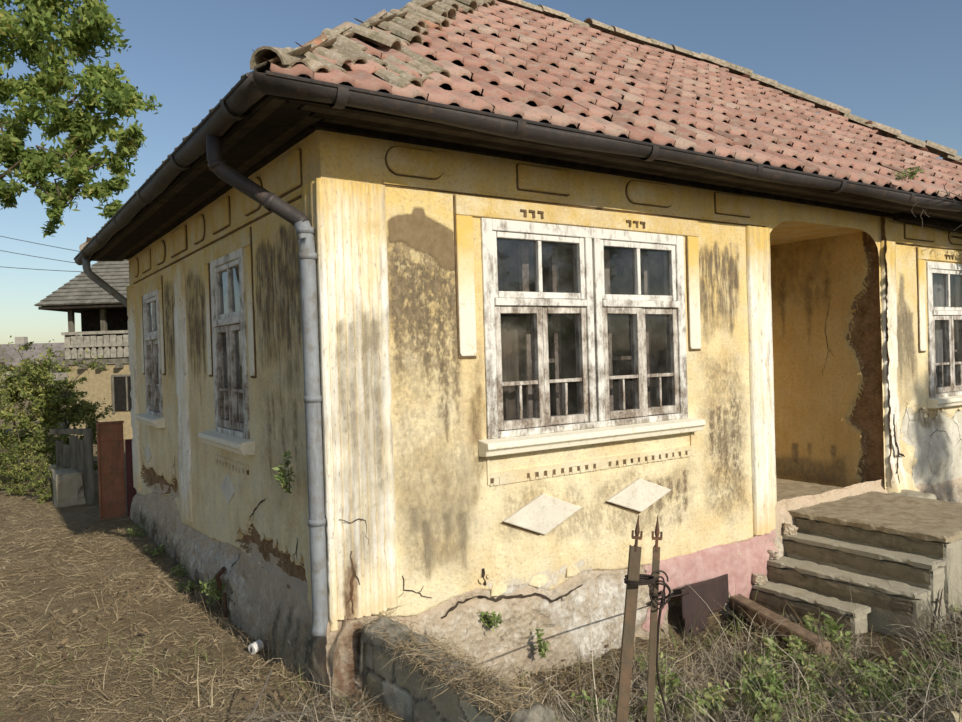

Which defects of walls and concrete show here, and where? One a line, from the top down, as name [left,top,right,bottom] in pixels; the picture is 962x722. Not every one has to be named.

leakage [256,227,301,347]
leakage [387,208,459,429]
leakage [699,243,738,324]
spalling [840,216,962,486]
spalling [141,460,179,499]
leakage [710,402,742,504]
spalling [191,513,307,588]
crack [339,518,369,614]
crack [398,575,432,598]